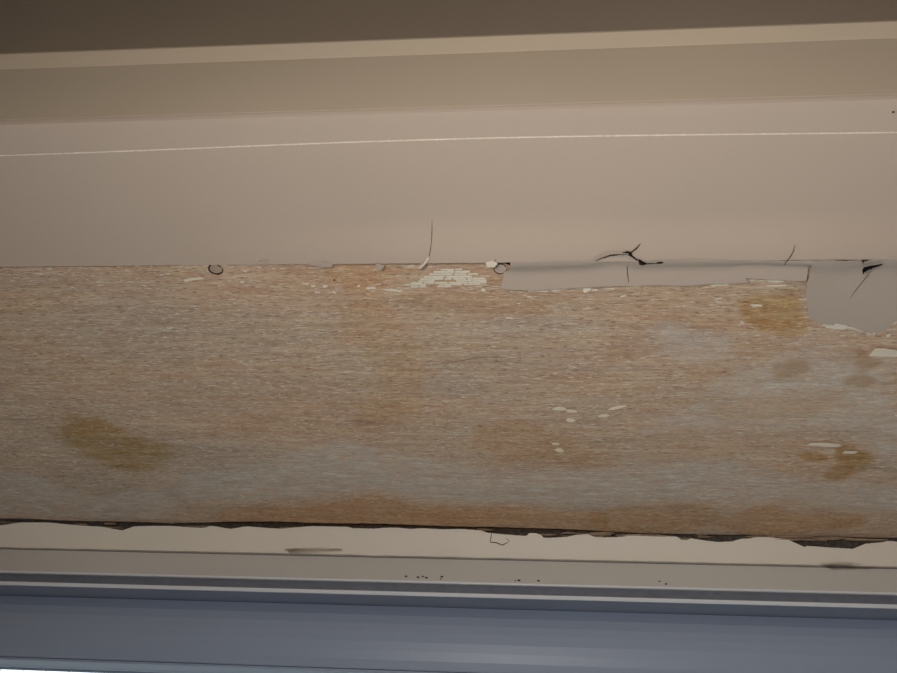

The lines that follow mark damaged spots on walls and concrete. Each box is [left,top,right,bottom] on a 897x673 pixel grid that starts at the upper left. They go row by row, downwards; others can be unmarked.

crack [596,243,664,265]
peeling [357,268,487,292]
peeling [499,252,897,337]
peeling [869,348,897,357]
peeling [807,443,858,454]
water stain [0,445,897,519]
crack [0,518,897,560]